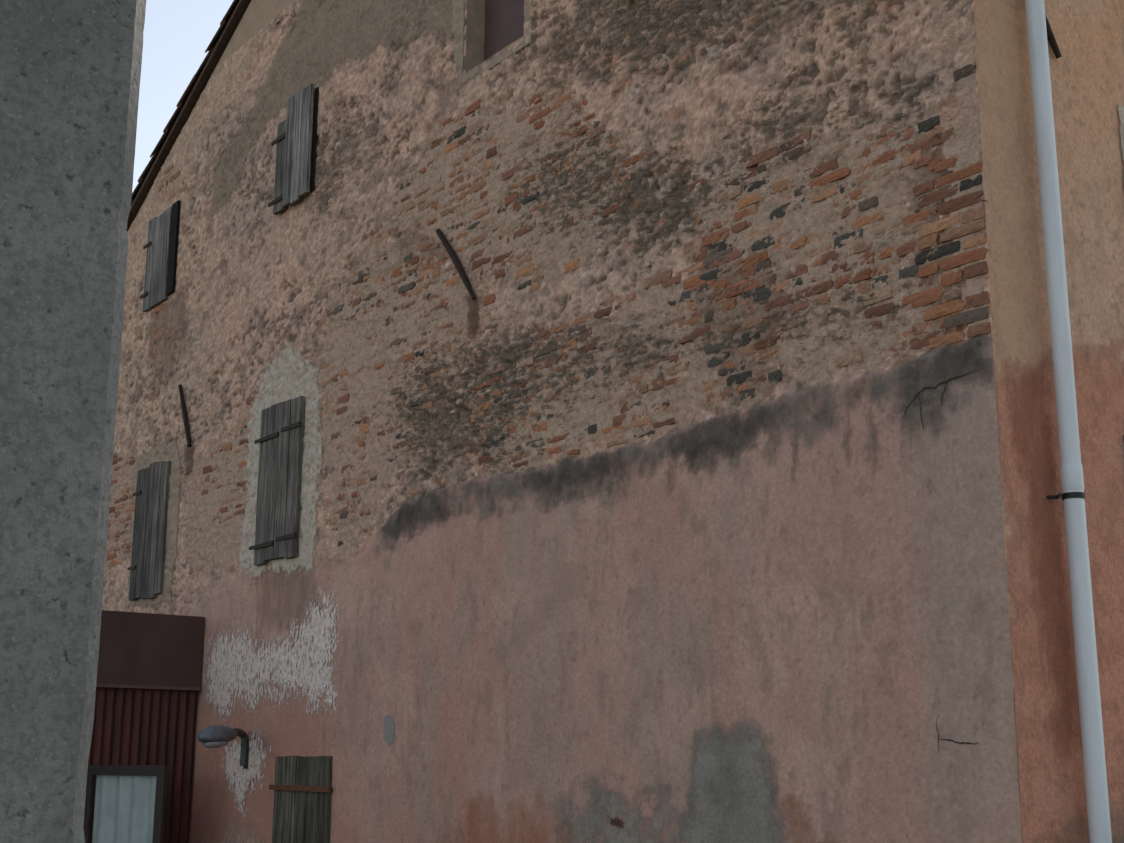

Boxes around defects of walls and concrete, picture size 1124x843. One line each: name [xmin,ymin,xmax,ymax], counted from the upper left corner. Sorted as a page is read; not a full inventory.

spalling [297,0,991,556]
damp [383,386,834,543]
damp [871,337,987,416]
crack [903,369,979,429]
peeling [203,584,340,726]
peeling [996,361,1090,843]
peeling [1072,341,1124,843]
peeling [221,728,272,818]
crack [936,717,976,750]